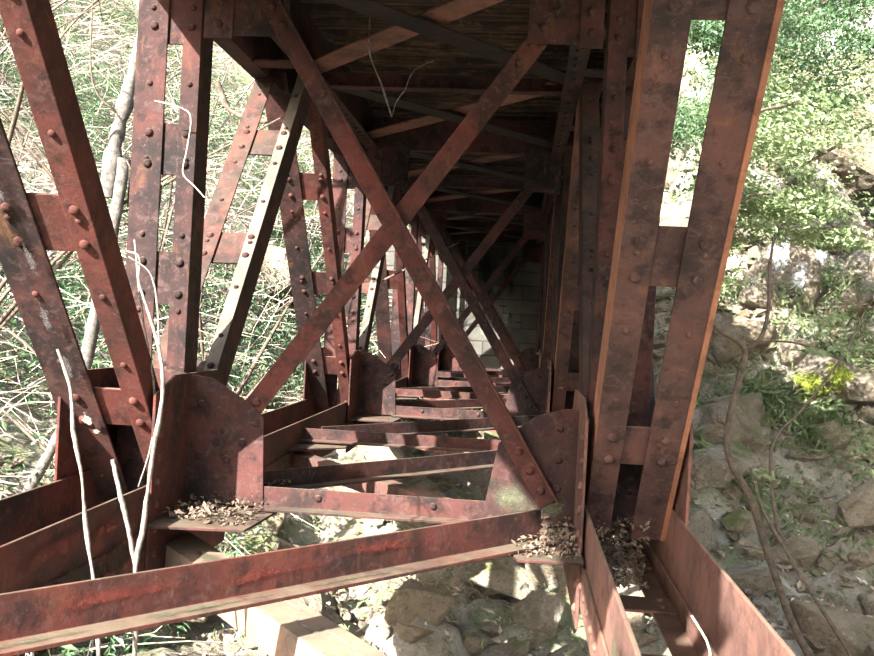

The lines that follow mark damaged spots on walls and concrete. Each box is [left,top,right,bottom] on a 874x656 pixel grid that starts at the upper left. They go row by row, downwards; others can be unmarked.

rust [0,191,12,237]
rust [54,543,131,585]